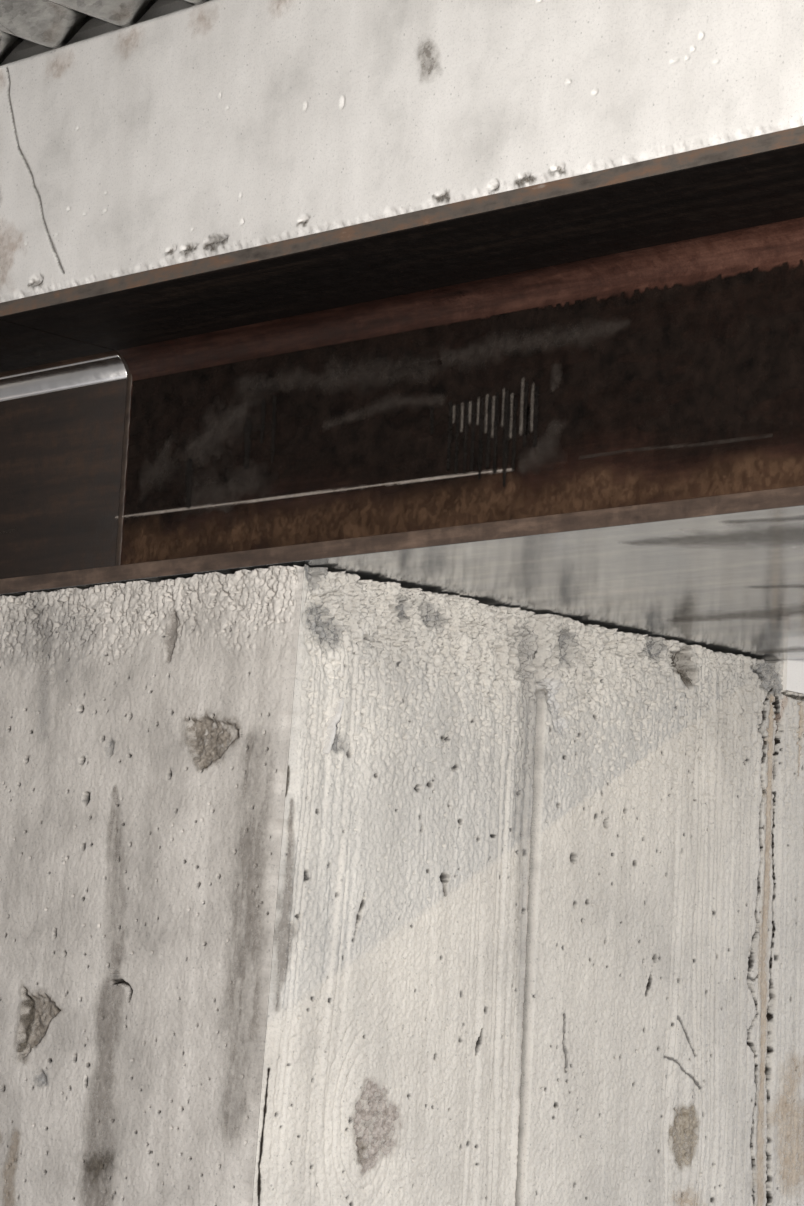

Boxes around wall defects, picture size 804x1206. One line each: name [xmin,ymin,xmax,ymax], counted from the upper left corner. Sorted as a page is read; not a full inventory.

water stain [419,45,435,74]
crack [7,68,65,273]
corrosion [126,456,804,564]
spalling [186,714,240,769]
water stain [228,811,263,1038]
water stain [276,800,294,1007]
crack [747,689,804,1206]
water stain [4,1132,18,1206]
spalling [17,992,61,1060]
water stain [83,944,122,1206]
spalling [353,1081,399,1173]
spalling [669,1106,698,1166]